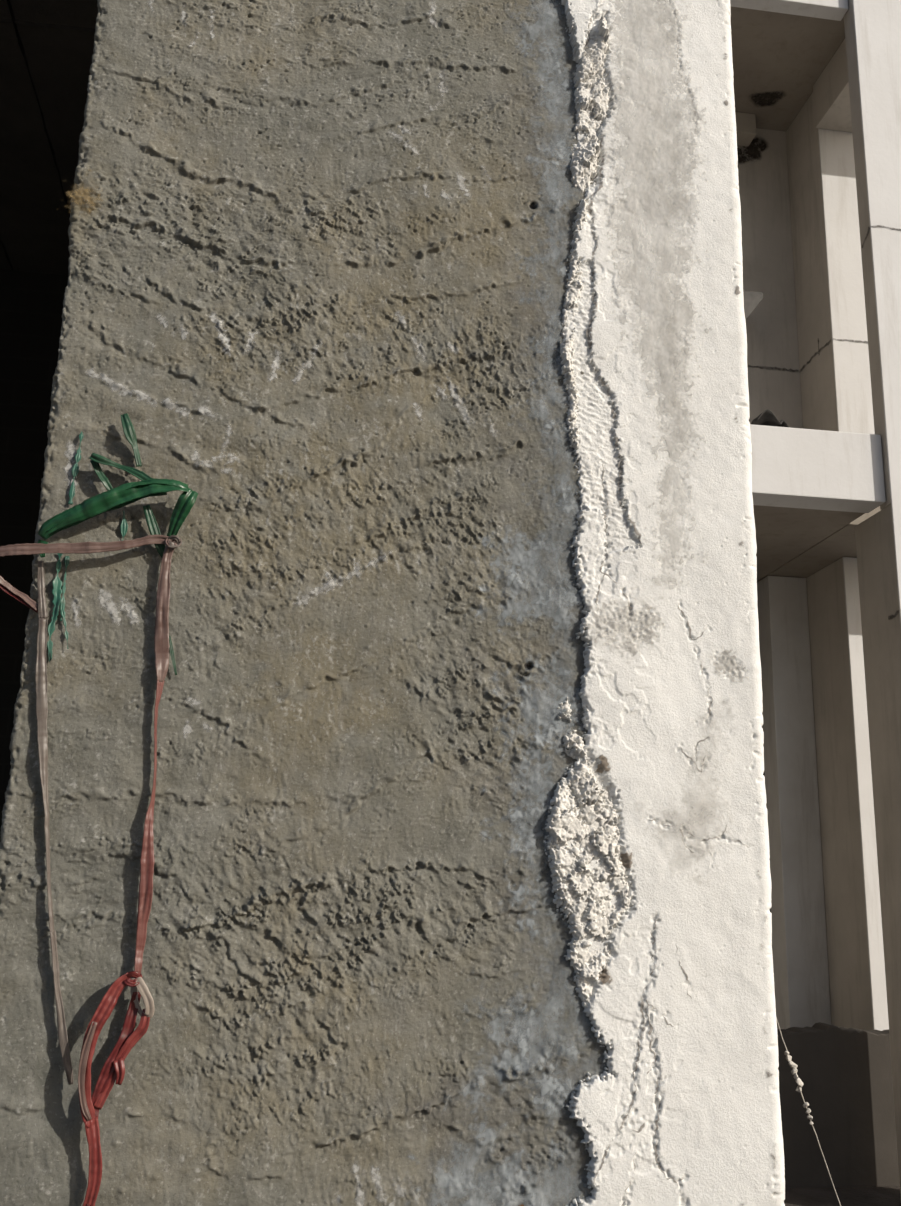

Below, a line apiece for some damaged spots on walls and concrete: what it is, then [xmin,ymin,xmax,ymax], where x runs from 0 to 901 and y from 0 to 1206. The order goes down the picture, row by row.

flaking render [558,0,712,589]
peeling [218,323,231,356]
peeling [269,352,281,381]
peeling [110,383,215,419]
peeling [192,451,236,473]
peeling [319,552,391,593]
peeling [99,589,139,624]
water stain [482,652,584,944]
flaking render [543,697,632,1008]
crack [594,921,691,1192]
water stain [432,971,606,1206]
peeling [371,1167,418,1206]